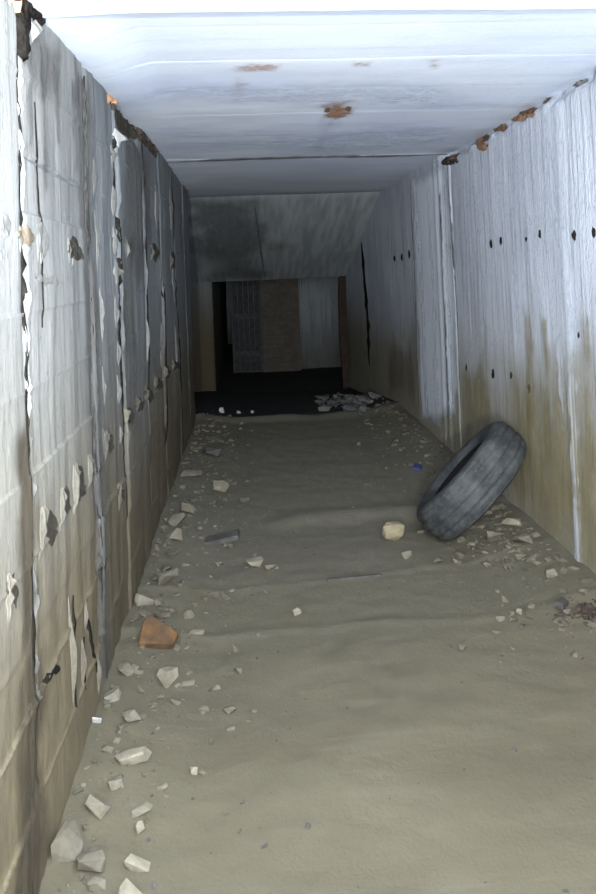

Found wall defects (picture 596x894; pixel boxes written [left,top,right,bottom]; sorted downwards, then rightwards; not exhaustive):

spalling [1,0,46,62]
spalling [107,94,158,158]
corrosion [324,104,352,119]
spalling [0,212,63,286]
leakage [556,298,587,562]
peeling [39,430,114,561]
peeling [5,573,19,626]